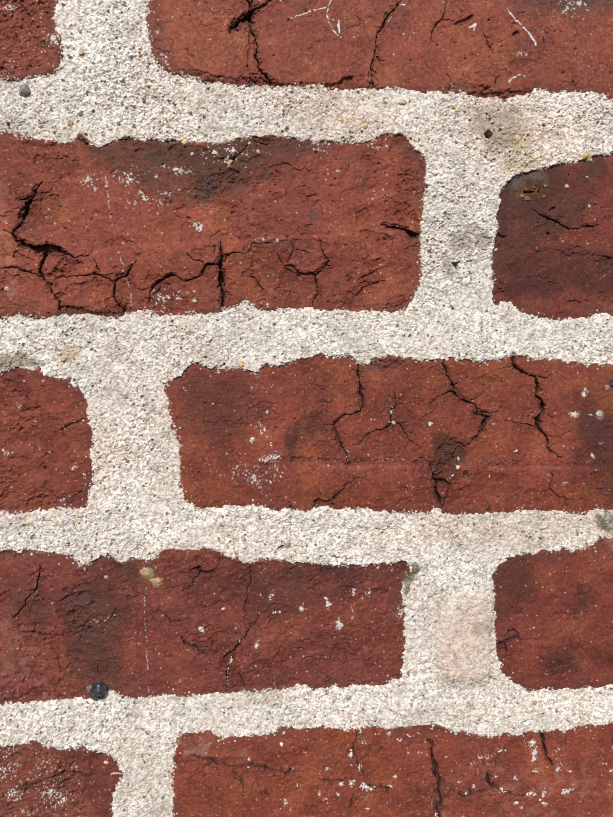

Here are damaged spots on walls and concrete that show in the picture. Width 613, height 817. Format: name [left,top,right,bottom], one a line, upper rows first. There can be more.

crack [227,0,274,86]
crack [369,0,403,89]
crack [428,0,455,45]
crack [483,33,500,86]
crack [0,179,139,316]
crack [146,237,331,309]
crack [351,264,394,301]
crack [379,223,421,240]
crack [302,356,576,534]
crack [190,751,294,800]
crack [317,729,392,809]
crack [414,731,555,817]